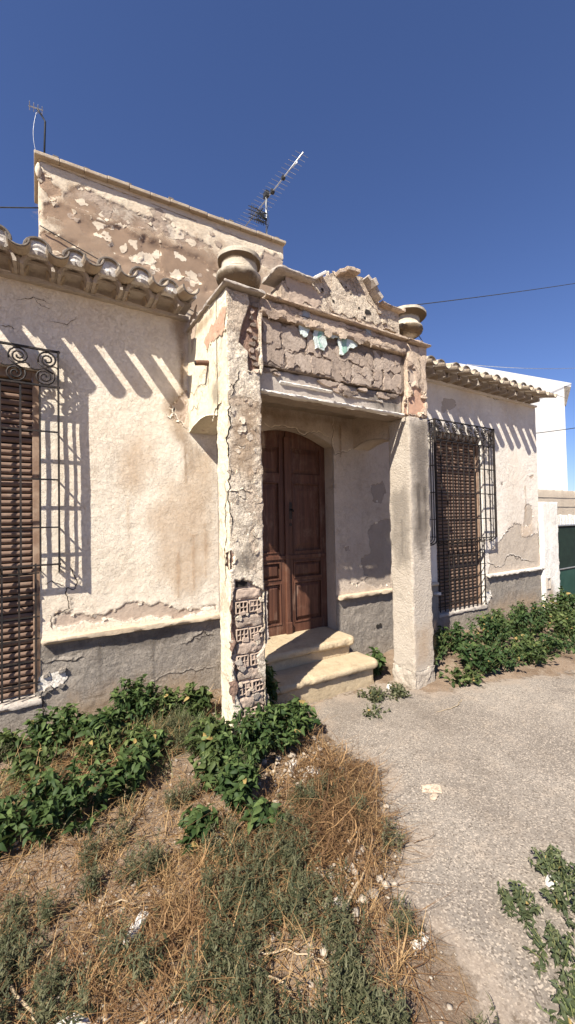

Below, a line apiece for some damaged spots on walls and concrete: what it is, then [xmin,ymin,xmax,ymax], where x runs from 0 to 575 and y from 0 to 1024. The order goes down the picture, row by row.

peeling [37,172,222,293]
spalling [189,304,226,352]
flaking render [239,250,427,418]
flaking render [228,395,261,454]
flaking render [252,527,263,555]
spalling [488,504,540,574]
spalling [54,601,216,627]
spalling [34,667,67,697]
crack [139,627,217,685]